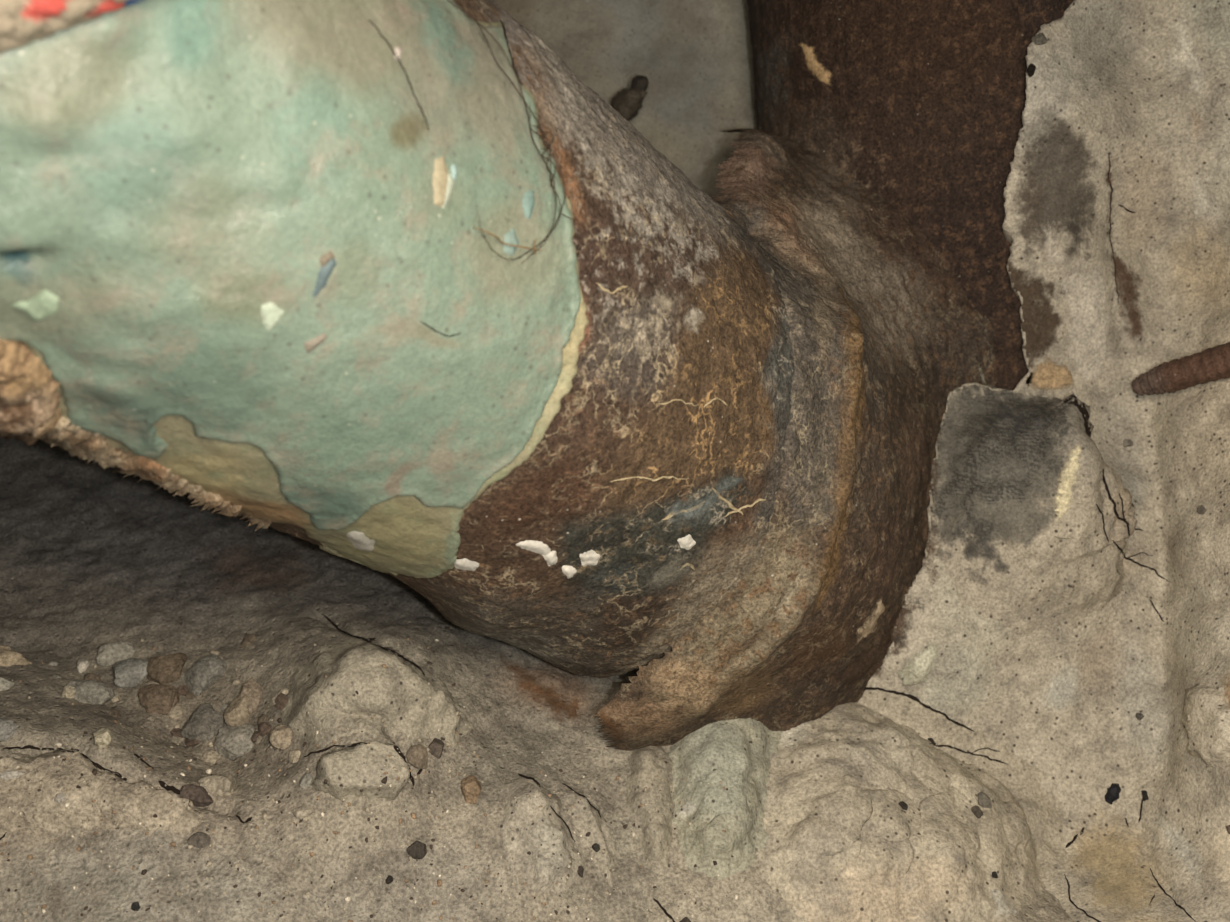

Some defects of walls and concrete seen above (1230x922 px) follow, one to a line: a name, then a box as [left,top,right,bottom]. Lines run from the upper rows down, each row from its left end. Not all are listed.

peeling [432,156,458,208]
damp [1015,120,1108,381]
corrosion [1008,262,1060,368]
corrosion [918,424,939,575]
efflorescence [1055,446,1081,518]
peeling [454,558,479,571]
peeling [516,540,600,579]
damp [957,509,1008,571]
crack [1096,469,1169,622]
corrosion [812,605,914,688]
crack [865,687,1007,764]
crack [2,745,180,795]